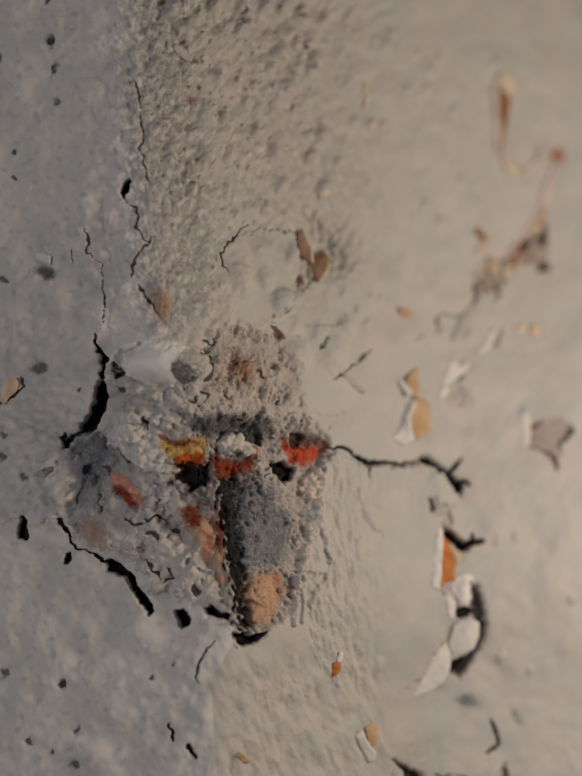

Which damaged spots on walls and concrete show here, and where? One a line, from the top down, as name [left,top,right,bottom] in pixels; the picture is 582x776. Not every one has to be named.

spalling [281,228,330,316]
peeling [471,207,550,295]
crack [68,228,125,444]
spalling [64,321,334,639]
rust [160,436,258,477]
rust [281,433,329,466]
crack [326,446,470,494]
spalling [520,411,575,469]
crack [57,518,154,615]
rust [181,506,224,582]
peeling [412,495,479,698]
crack [443,530,484,552]